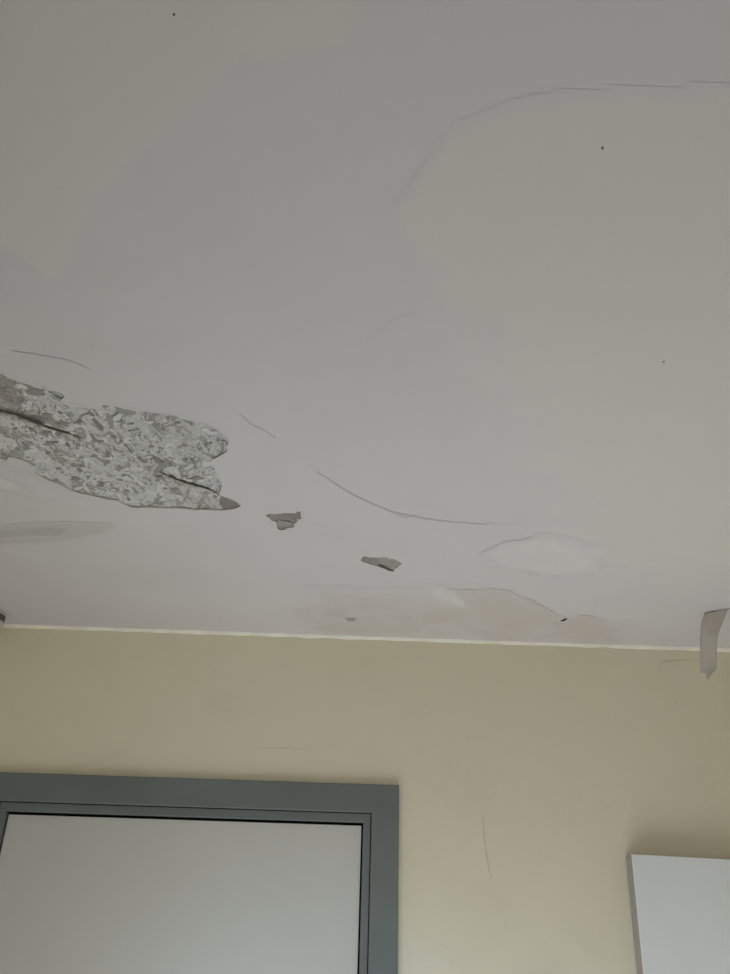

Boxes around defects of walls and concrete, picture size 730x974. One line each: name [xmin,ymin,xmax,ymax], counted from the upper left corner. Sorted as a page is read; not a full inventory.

peeling [0,371,243,511]
peeling [264,512,301,530]
peeling [360,556,403,572]
peeling [700,608,729,679]